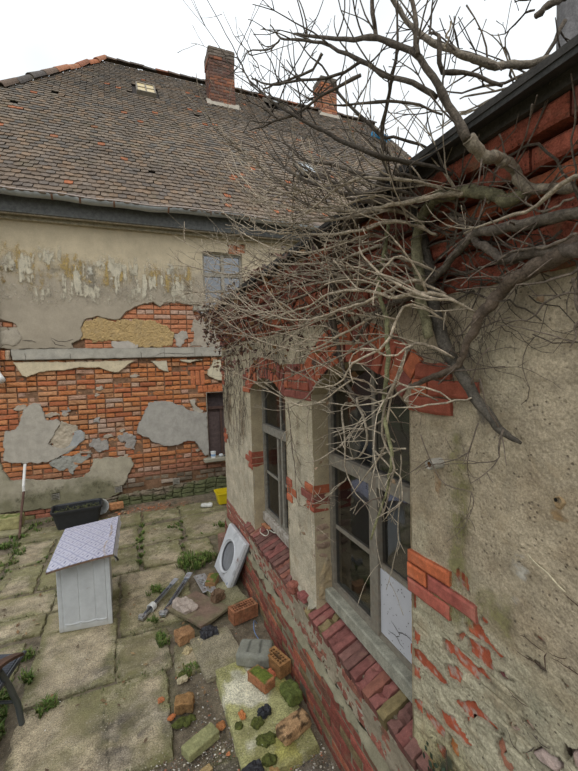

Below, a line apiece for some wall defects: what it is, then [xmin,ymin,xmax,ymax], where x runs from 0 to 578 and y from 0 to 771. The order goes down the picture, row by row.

peeling [81,302,220,348]
peeling [0,350,226,488]
peeling [411,617,508,684]
peeling [415,699,472,759]
peeling [457,699,498,729]
peeling [499,738,514,771]
spalling [526,746,578,771]